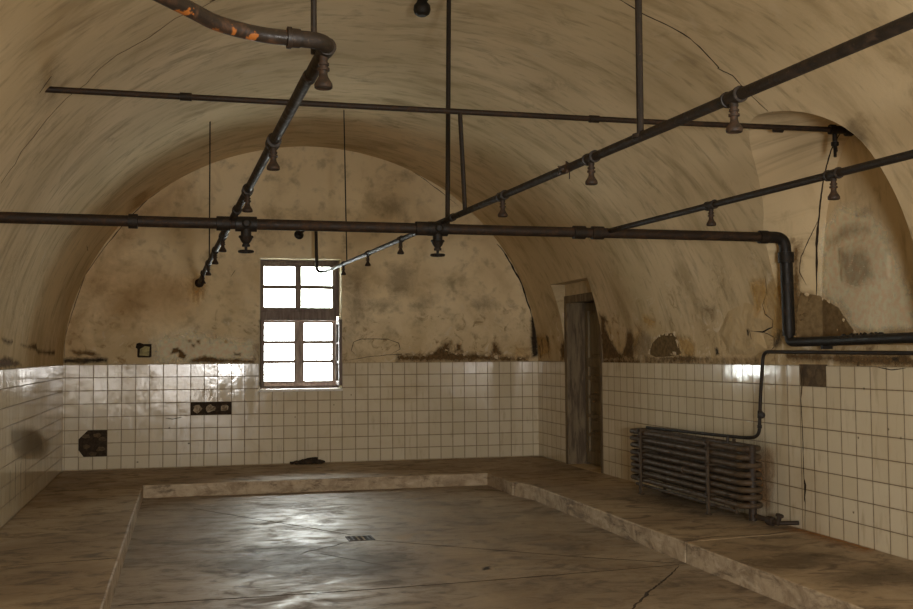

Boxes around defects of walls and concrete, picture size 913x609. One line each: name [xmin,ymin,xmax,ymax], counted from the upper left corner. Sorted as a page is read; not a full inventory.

crack [1,15,182,183]
crack [621,0,763,107]
peeling [797,208,913,337]
peeling [159,331,255,361]
flaking render [648,331,682,357]
crack [798,367,806,504]
crack [193,508,381,565]
crack [118,540,679,609]